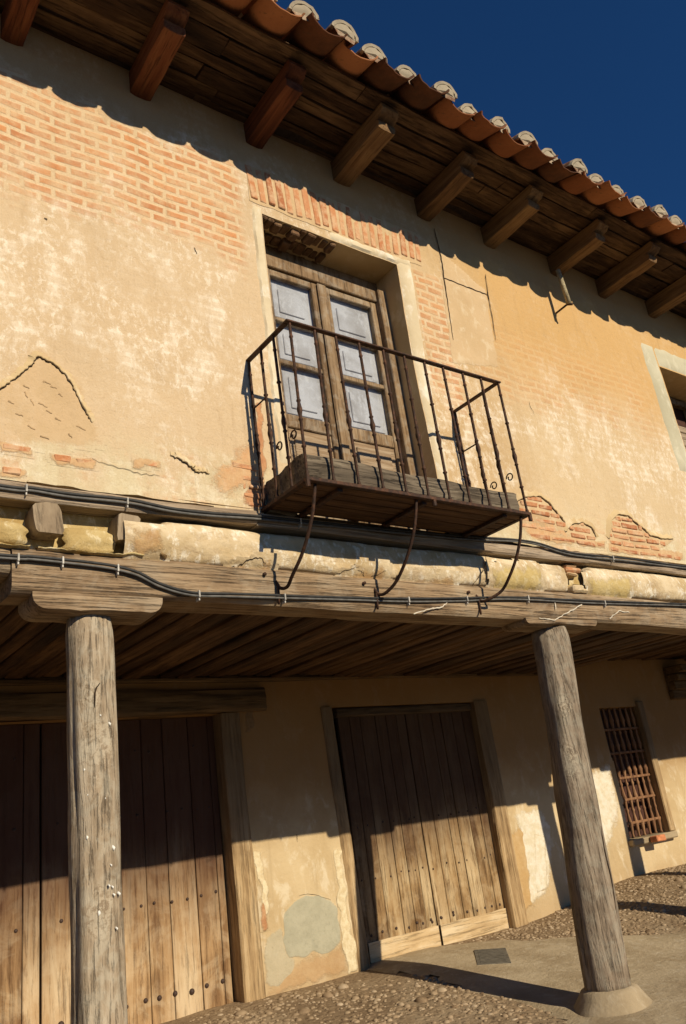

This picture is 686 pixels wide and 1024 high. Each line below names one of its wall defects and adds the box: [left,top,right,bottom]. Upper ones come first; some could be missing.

crack [0,351,95,422]
spalling [0,441,99,482]
crack [92,450,210,476]
spalling [516,490,684,561]
peeling [511,803,557,905]
spalling [253,848,271,932]
spalling [331,847,359,975]